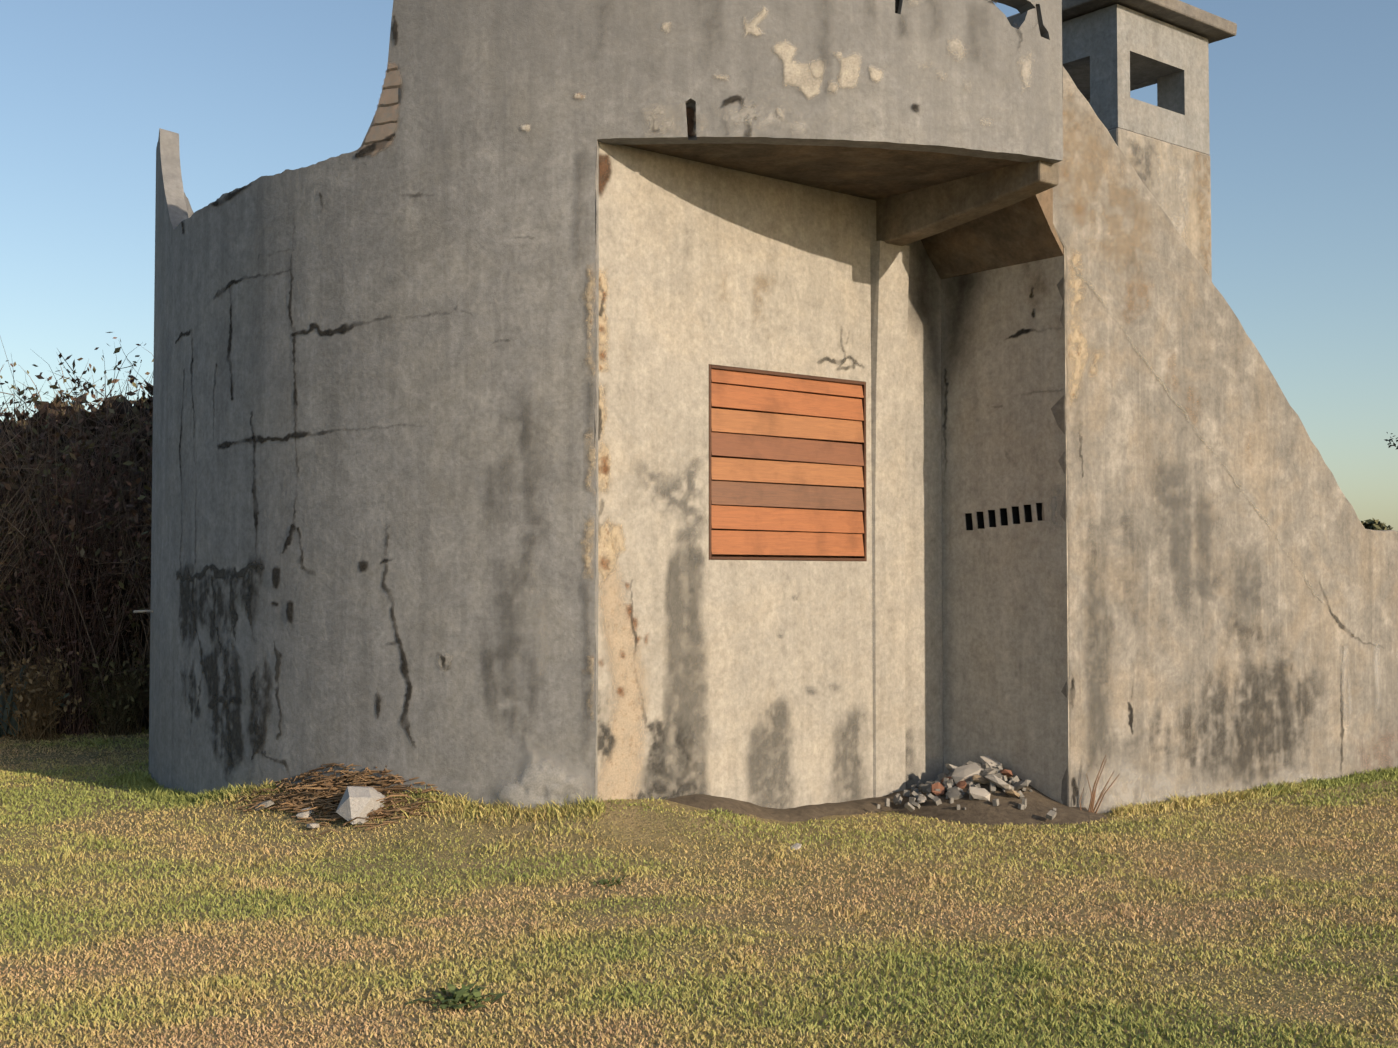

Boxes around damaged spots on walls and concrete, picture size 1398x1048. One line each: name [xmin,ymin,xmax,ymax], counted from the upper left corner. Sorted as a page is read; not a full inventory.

spalling [355,63,402,158]
peeling [745,9,767,36]
peeling [774,41,882,98]
crack [175,274,354,569]
leakage [662,471,694,512]
leakage [176,559,287,771]
crack [376,535,414,744]
leakage [638,533,706,799]
leakage [750,703,790,809]
leakage [835,713,860,801]